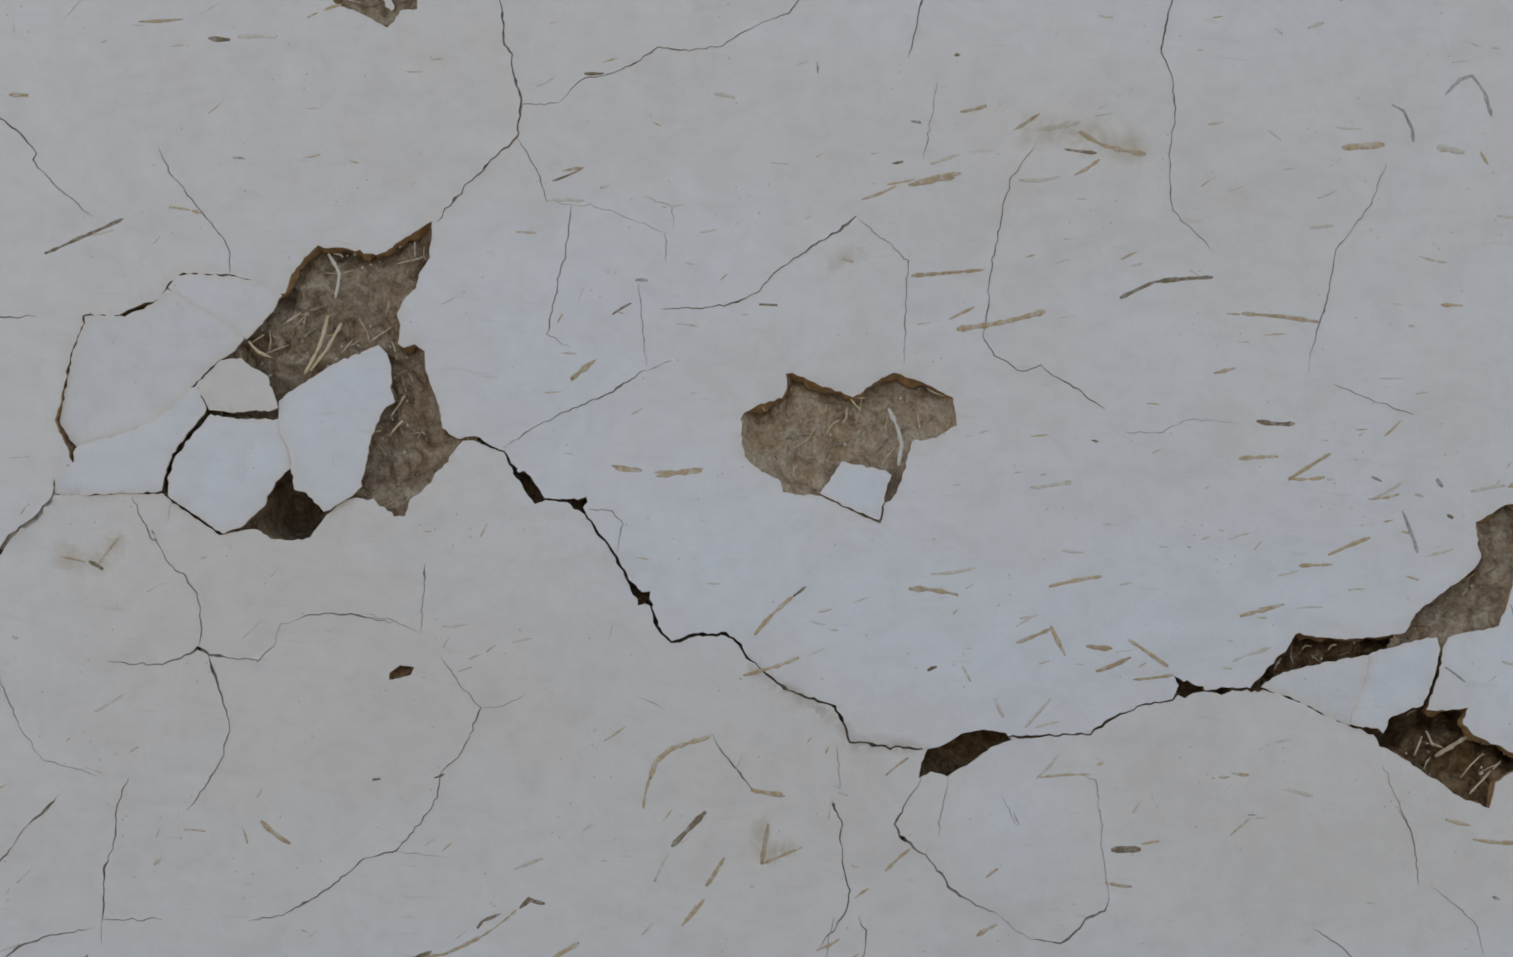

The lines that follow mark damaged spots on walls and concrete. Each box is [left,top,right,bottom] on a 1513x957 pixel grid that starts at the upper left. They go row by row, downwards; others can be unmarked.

spalling [333,0,417,27]
crack [437,0,799,346]
crack [0,489,55,555]
crack [0,680,158,957]
spalling [54,225,481,540]
crack [109,498,426,806]
crack [250,661,526,921]
crack [478,216,1109,957]
spalling [741,374,956,523]
hole [919,730,1013,777]
crack [1013,678,1256,739]
spalling [1251,506,1513,807]